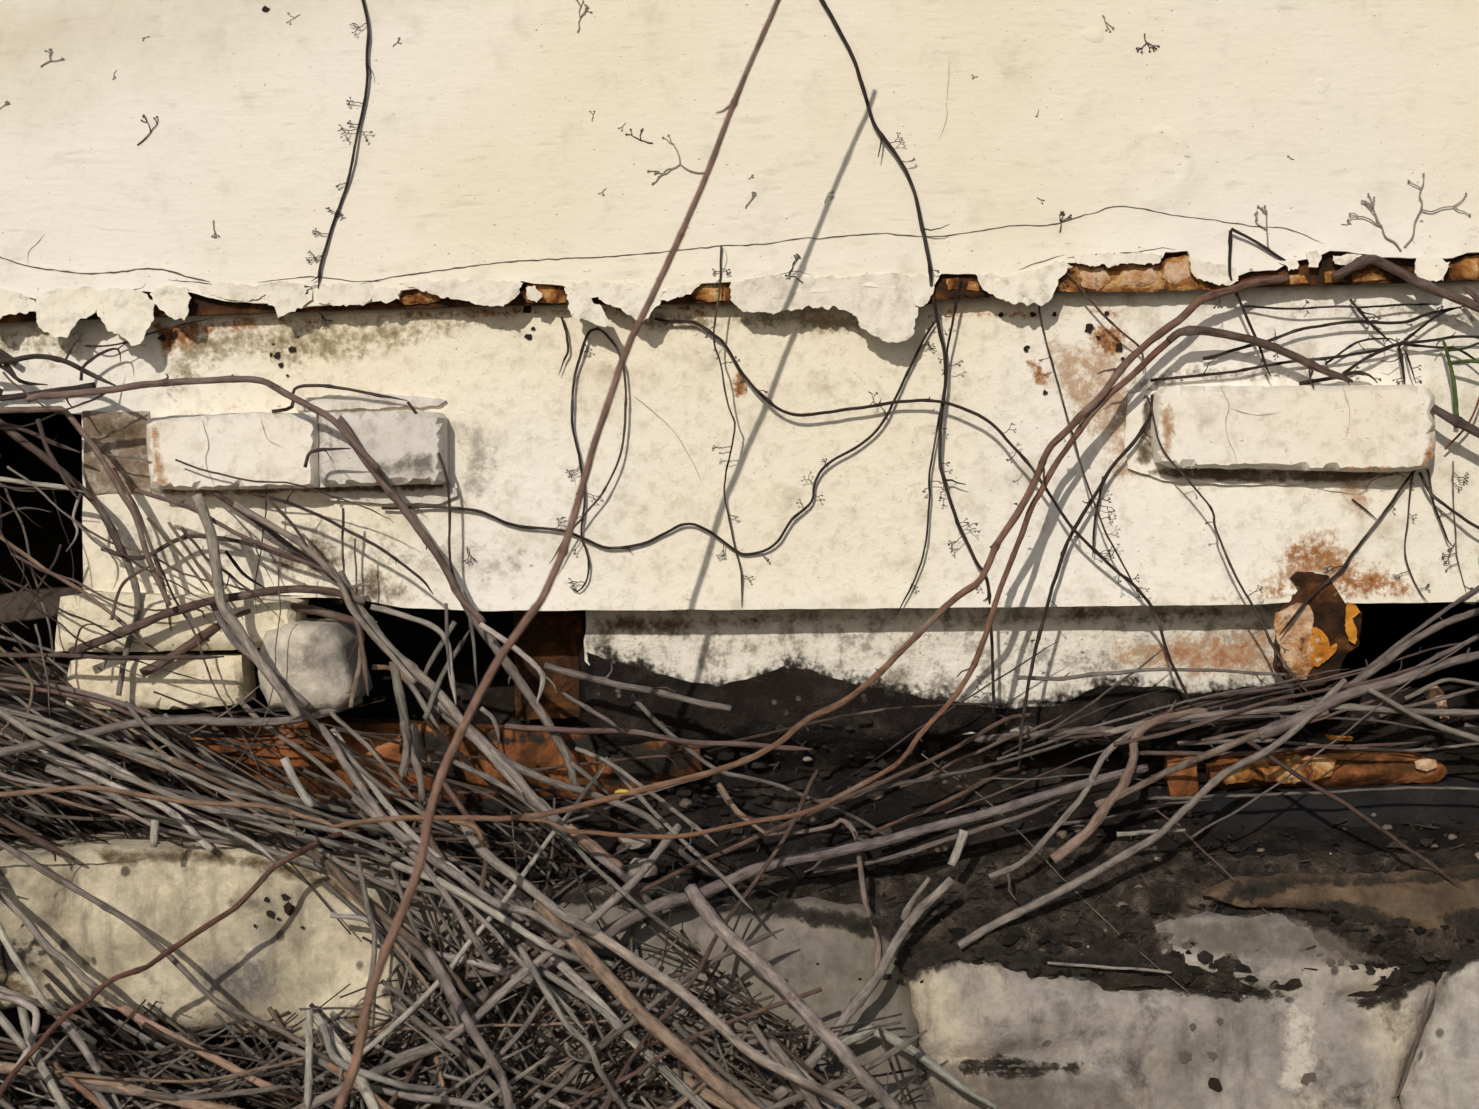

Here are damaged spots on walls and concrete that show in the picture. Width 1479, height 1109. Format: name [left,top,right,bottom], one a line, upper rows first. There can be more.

peeling [0,277,542,346]
peeling [564,280,701,327]
peeling [729,272,935,343]
peeling [977,252,1162,306]
peeling [1188,256,1239,286]
peeling [1279,250,1362,271]
peeling [1414,256,1450,282]
rust [1026,254,1416,476]
rust [1116,530,1409,691]
rust [1205,749,1447,790]